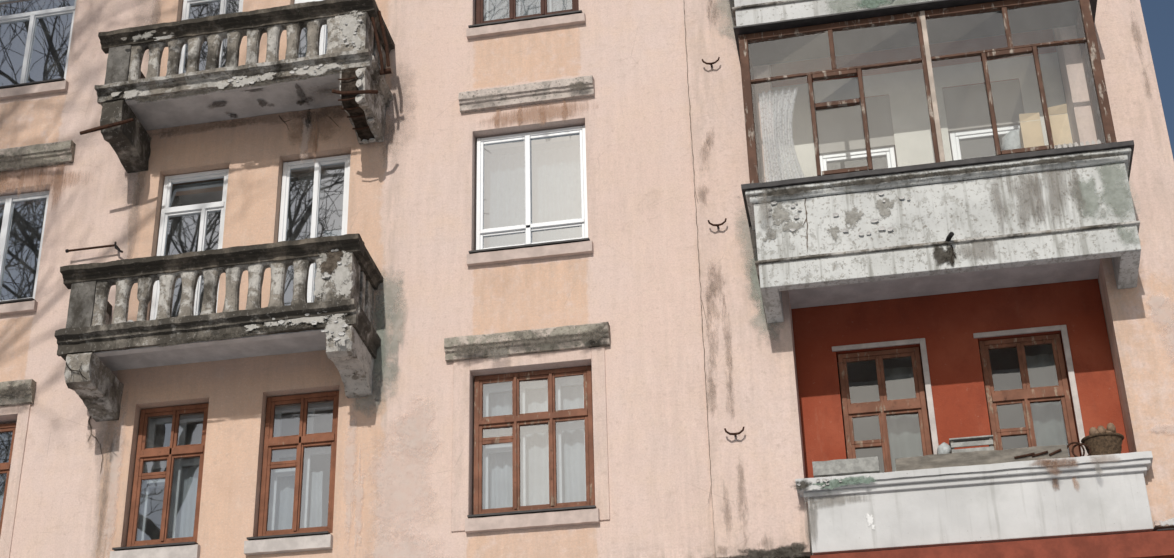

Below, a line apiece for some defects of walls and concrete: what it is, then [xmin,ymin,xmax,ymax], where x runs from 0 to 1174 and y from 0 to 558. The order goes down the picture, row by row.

spalling [121,30,174,42]
peeling [335,10,363,50]
corrosion [80,118,134,135]
spalling [111,62,376,144]
damp [1074,166,1136,240]
peeling [156,249,354,347]
crack [684,10,716,558]
damp [933,244,956,266]
damp [357,279,404,408]
crack [88,416,103,473]